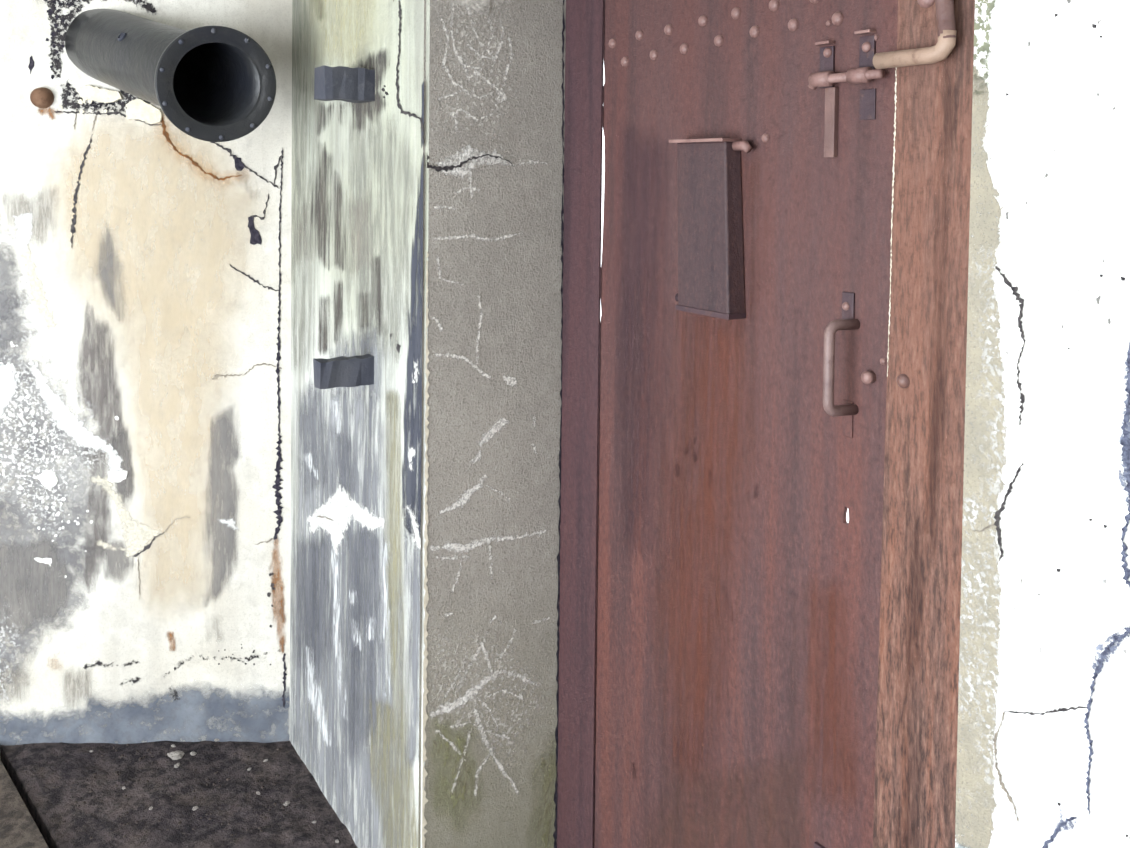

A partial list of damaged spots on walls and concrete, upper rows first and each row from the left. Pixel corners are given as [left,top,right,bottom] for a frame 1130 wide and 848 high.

spalling [44,0,163,126]
crack [70,108,98,248]
peeling [0,342,161,557]
leakage [0,51,421,848]
crack [161,116,283,545]
rust [267,539,285,653]
crack [280,653,288,708]
crack [393,0,565,848]
crack [975,462,1023,561]
crack [995,266,1025,426]
crack [993,628,1130,848]
crack [1119,341,1130,588]